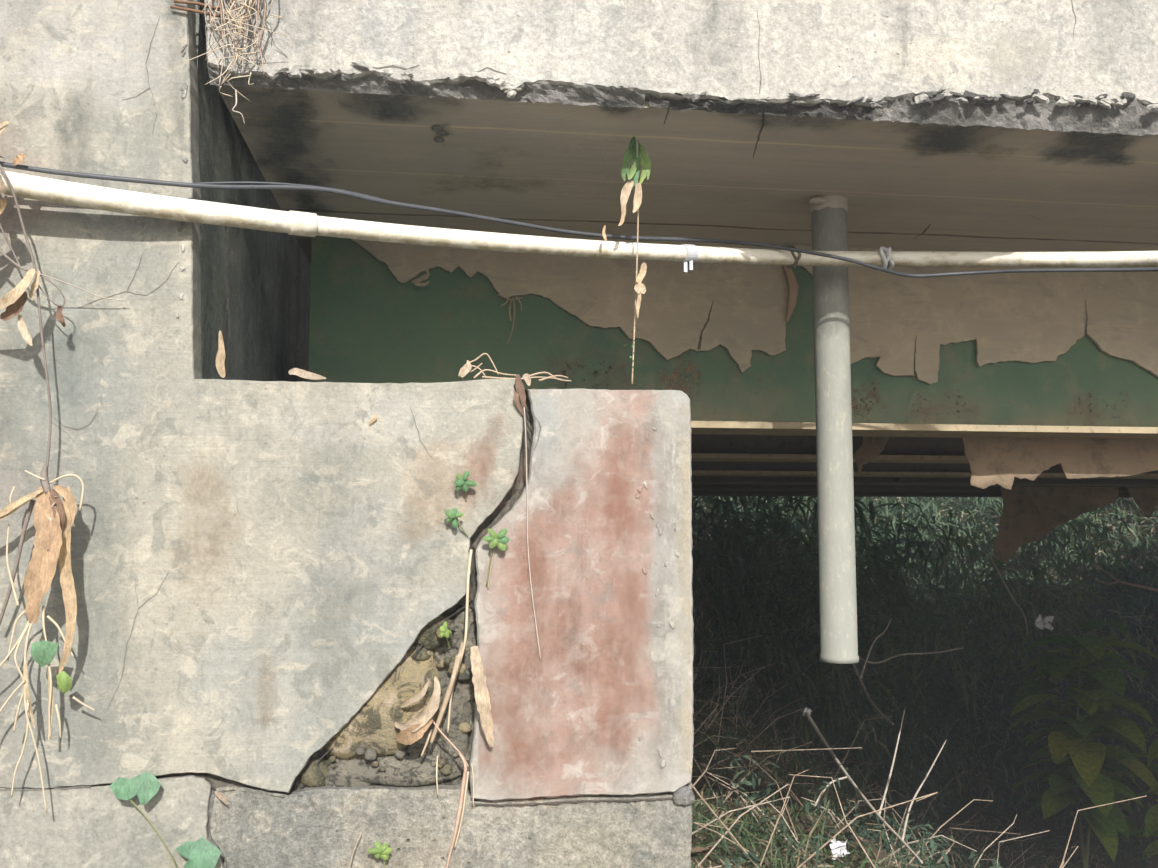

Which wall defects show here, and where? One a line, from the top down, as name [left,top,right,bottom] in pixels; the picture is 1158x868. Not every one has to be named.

corrosion [170,0,220,18]
spalling [207,62,1158,136]
crack [753,11,765,158]
peeling [531,235,812,251]
peeling [351,239,813,373]
peeling [848,266,1158,385]
crack [435,386,542,609]
crack [0,783,111,791]
crack [155,773,302,868]